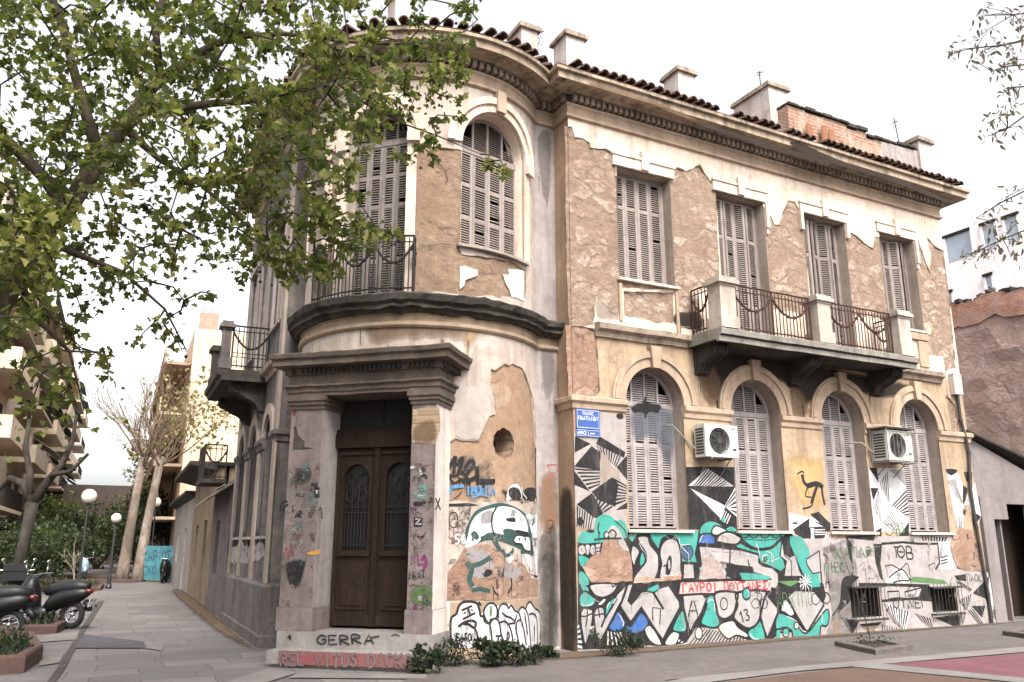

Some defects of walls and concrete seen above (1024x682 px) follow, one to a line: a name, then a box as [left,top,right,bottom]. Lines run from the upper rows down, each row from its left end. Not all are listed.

peeling [415,147,526,301]
peeling [564,126,719,397]
peeling [763,200,808,314]
peeling [844,227,887,317]
peeling [913,238,956,371]
peeling [449,363,537,502]
flaking render [447,544,538,601]